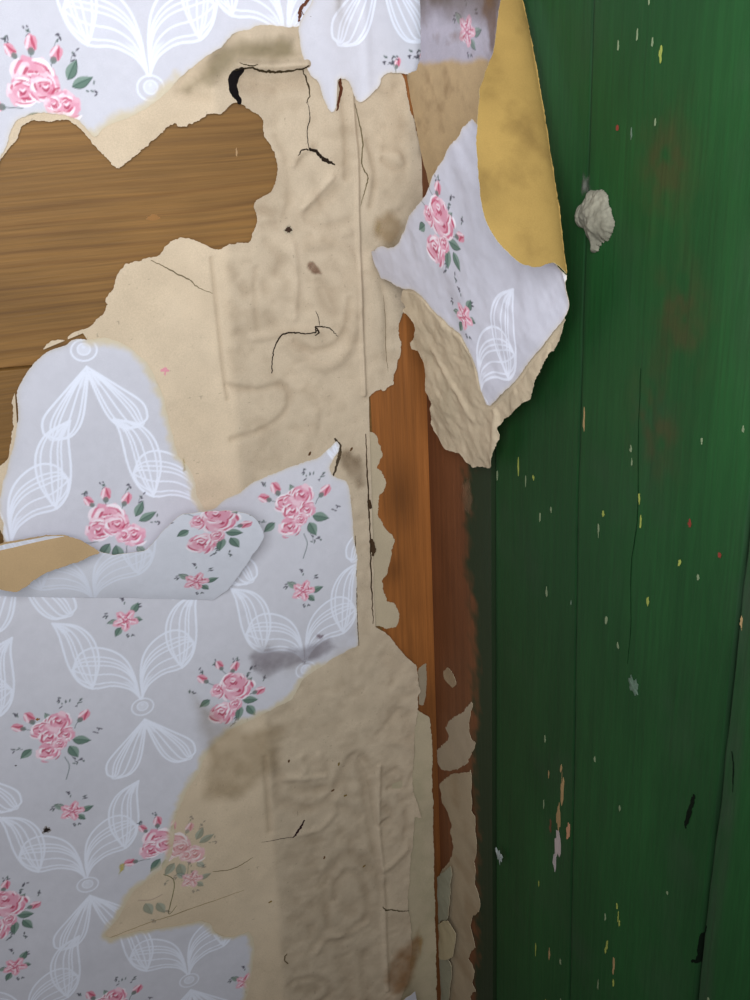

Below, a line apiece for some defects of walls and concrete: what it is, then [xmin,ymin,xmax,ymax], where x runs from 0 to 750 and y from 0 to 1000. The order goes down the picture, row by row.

crack [238,63,335,165]
crack [355,105,369,204]
crack [271,312,337,373]
peeling [83,25,456,1000]